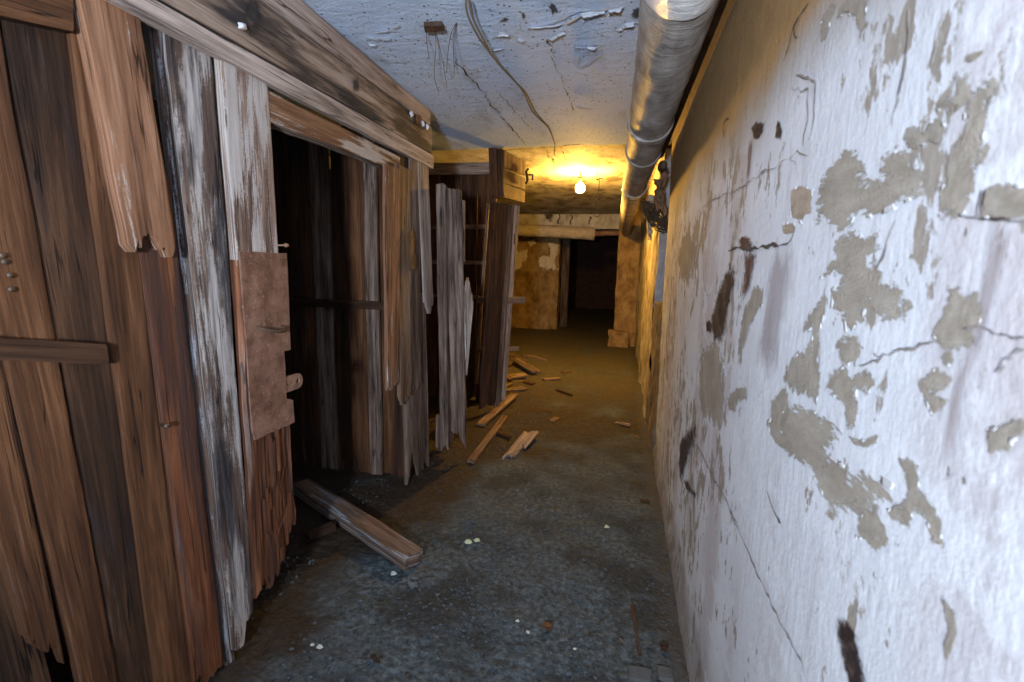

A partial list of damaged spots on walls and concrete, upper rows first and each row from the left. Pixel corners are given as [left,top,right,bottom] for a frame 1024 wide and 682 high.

peeling [476,5,638,51]
crack [455,59,602,166]
crack [701,2,816,208]
peeling [766,50,1024,552]
crack [861,341,936,367]
crack [964,327,1024,374]
crack [694,440,806,679]